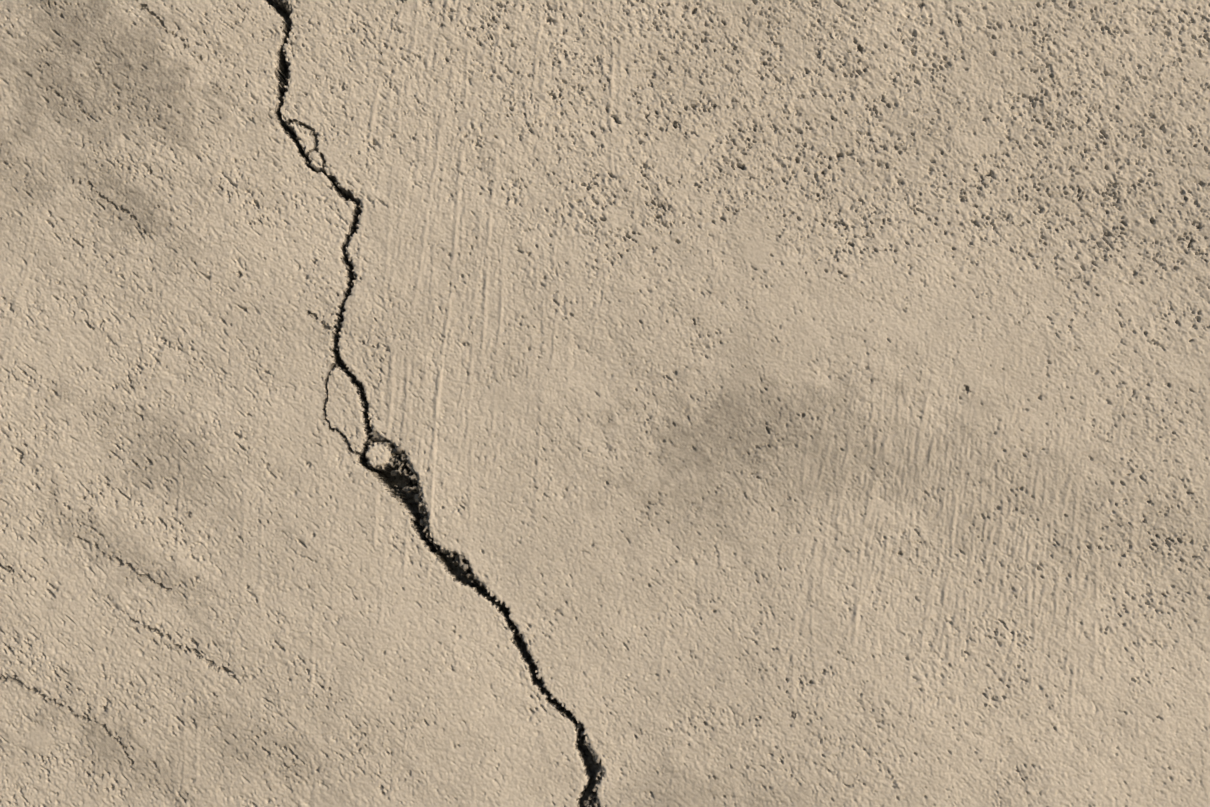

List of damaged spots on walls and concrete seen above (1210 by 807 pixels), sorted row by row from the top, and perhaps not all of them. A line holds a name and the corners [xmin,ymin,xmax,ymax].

crack [265,0,445,558]
crack [475,580,592,779]